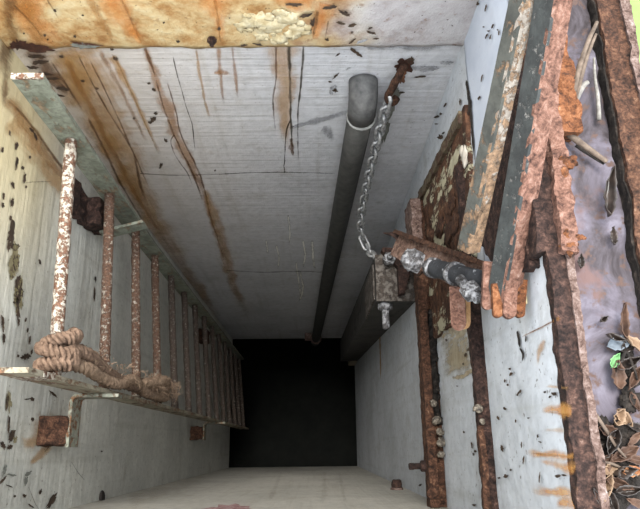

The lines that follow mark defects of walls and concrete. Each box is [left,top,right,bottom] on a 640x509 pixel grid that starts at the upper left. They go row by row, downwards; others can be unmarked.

corrosion [4,0,27,31]
corrosion [28,53,75,98]
corrosion [79,58,129,144]
damp [233,8,337,162]
corrosion [89,120,138,212]
corrosion [168,58,215,230]
crack [226,162,305,174]
corrosion [547,405,571,415]
corrosion [535,452,573,470]
corrosion [545,488,574,507]